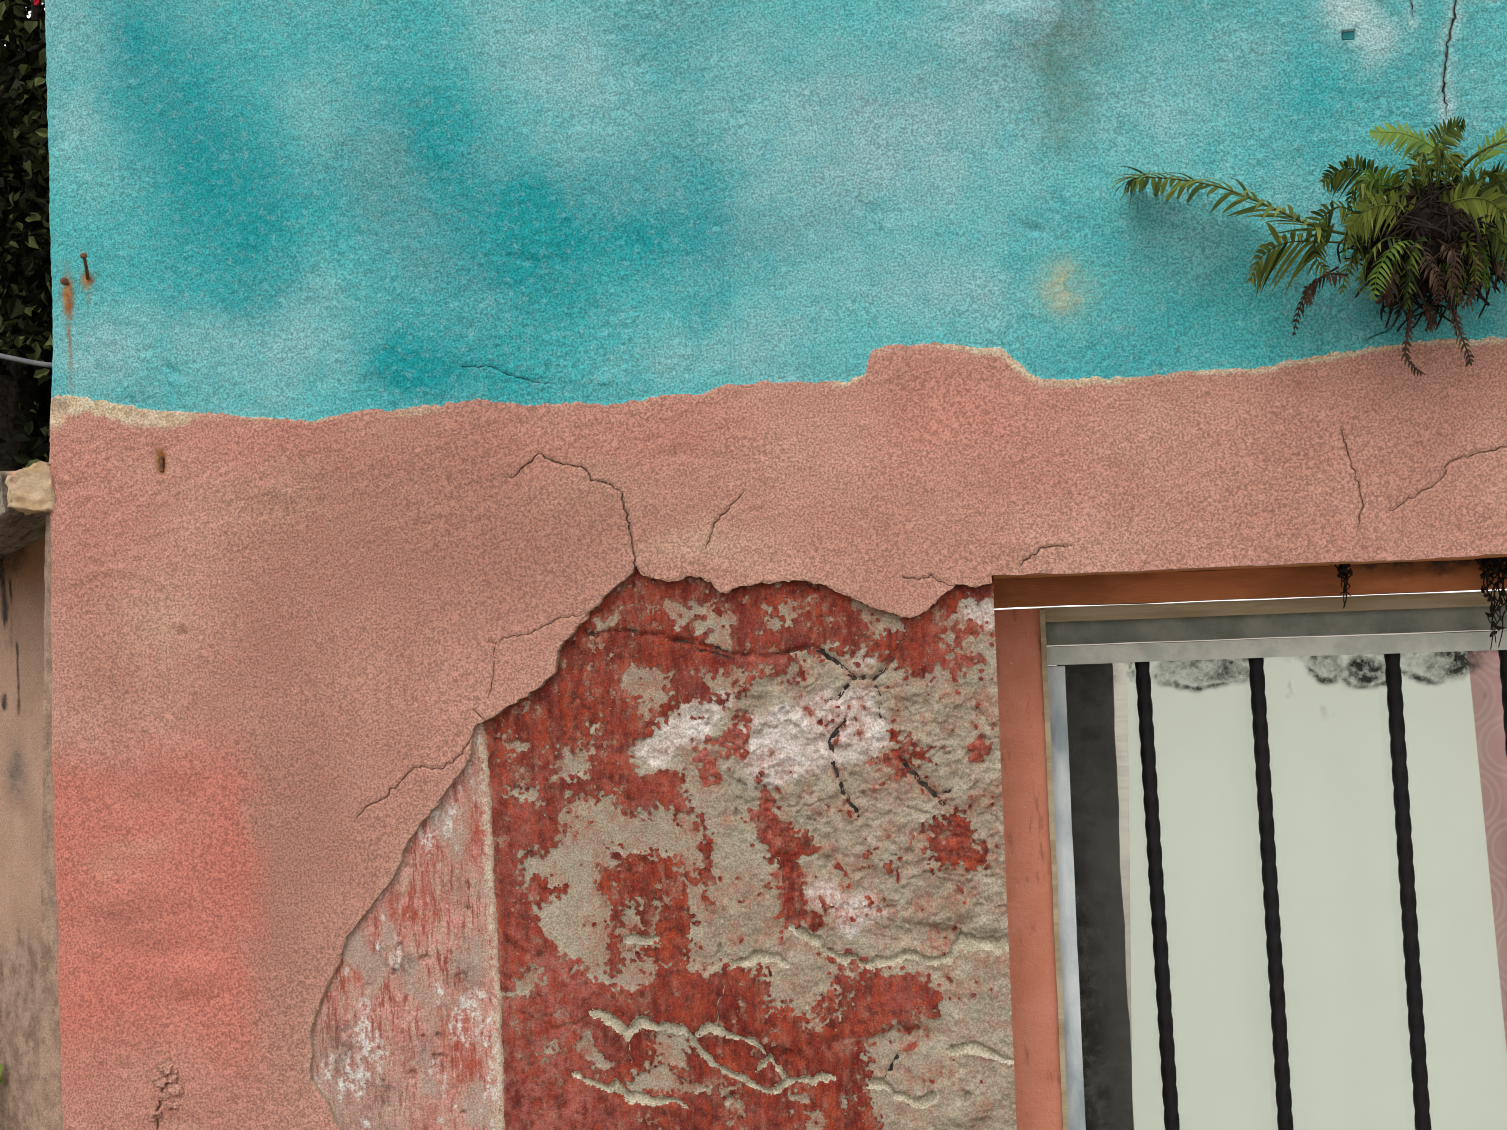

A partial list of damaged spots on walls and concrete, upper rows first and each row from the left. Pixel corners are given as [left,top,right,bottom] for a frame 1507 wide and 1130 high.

crack [1442,0,1457,119]
corrosion [63,274,93,347]
crack [504,453,636,567]
crack [356,616,637,817]
crack [675,639,732,659]
crack [775,639,905,818]
spalling [312,567,1017,1130]
crack [530,926,1014,1109]